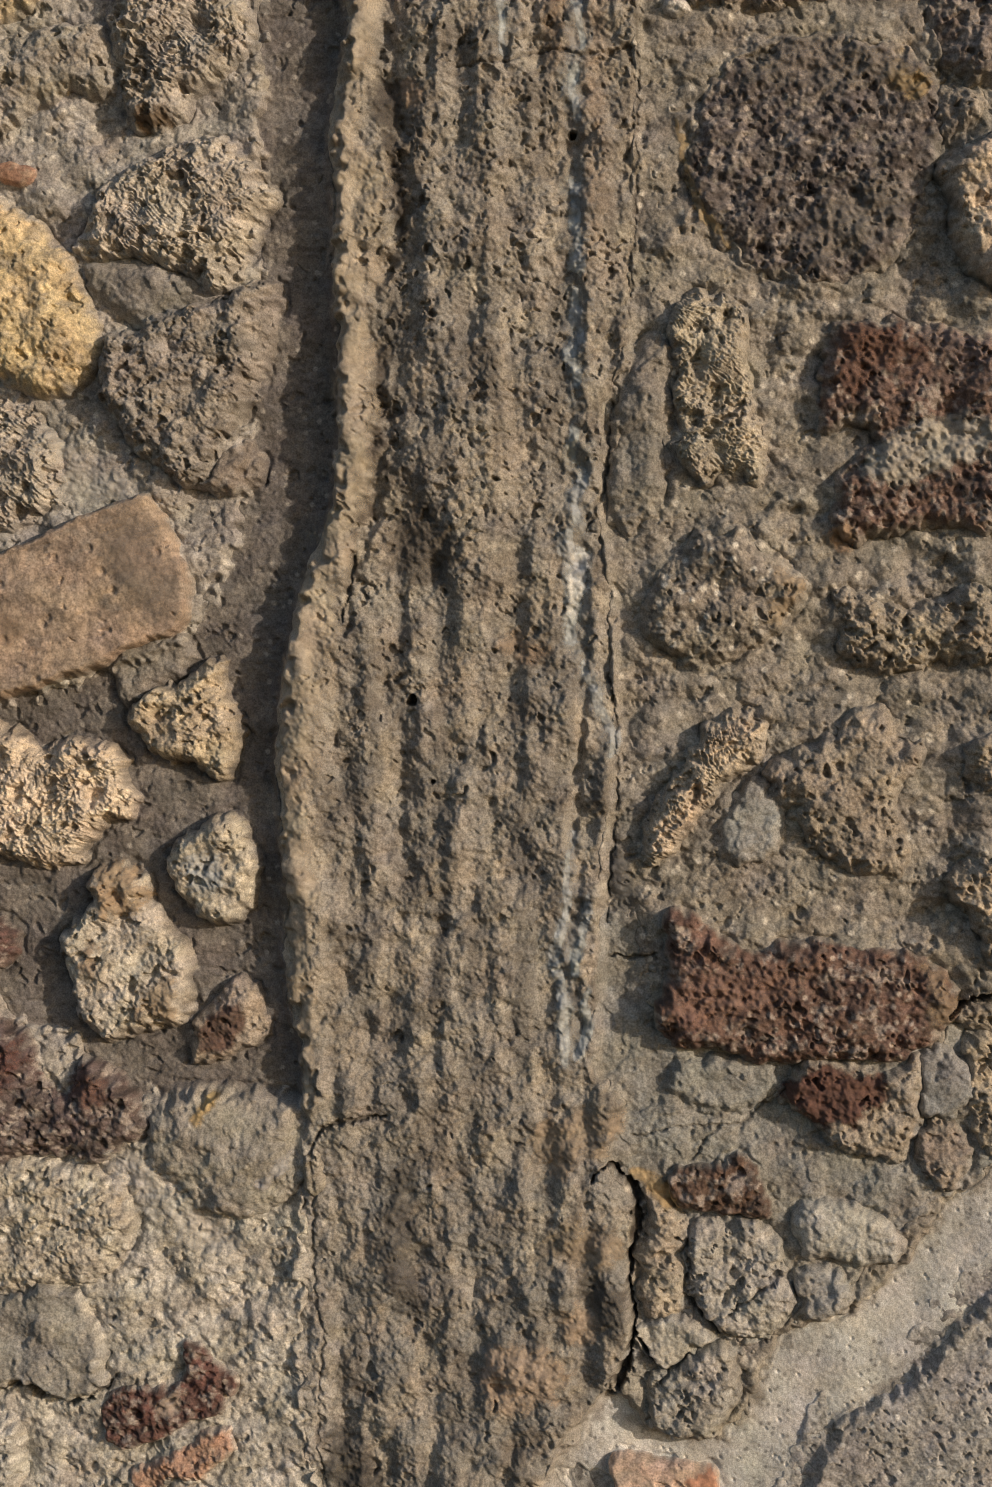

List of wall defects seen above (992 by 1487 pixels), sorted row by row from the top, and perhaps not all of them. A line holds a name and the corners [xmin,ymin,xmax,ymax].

crack [592,1161,649,1387]